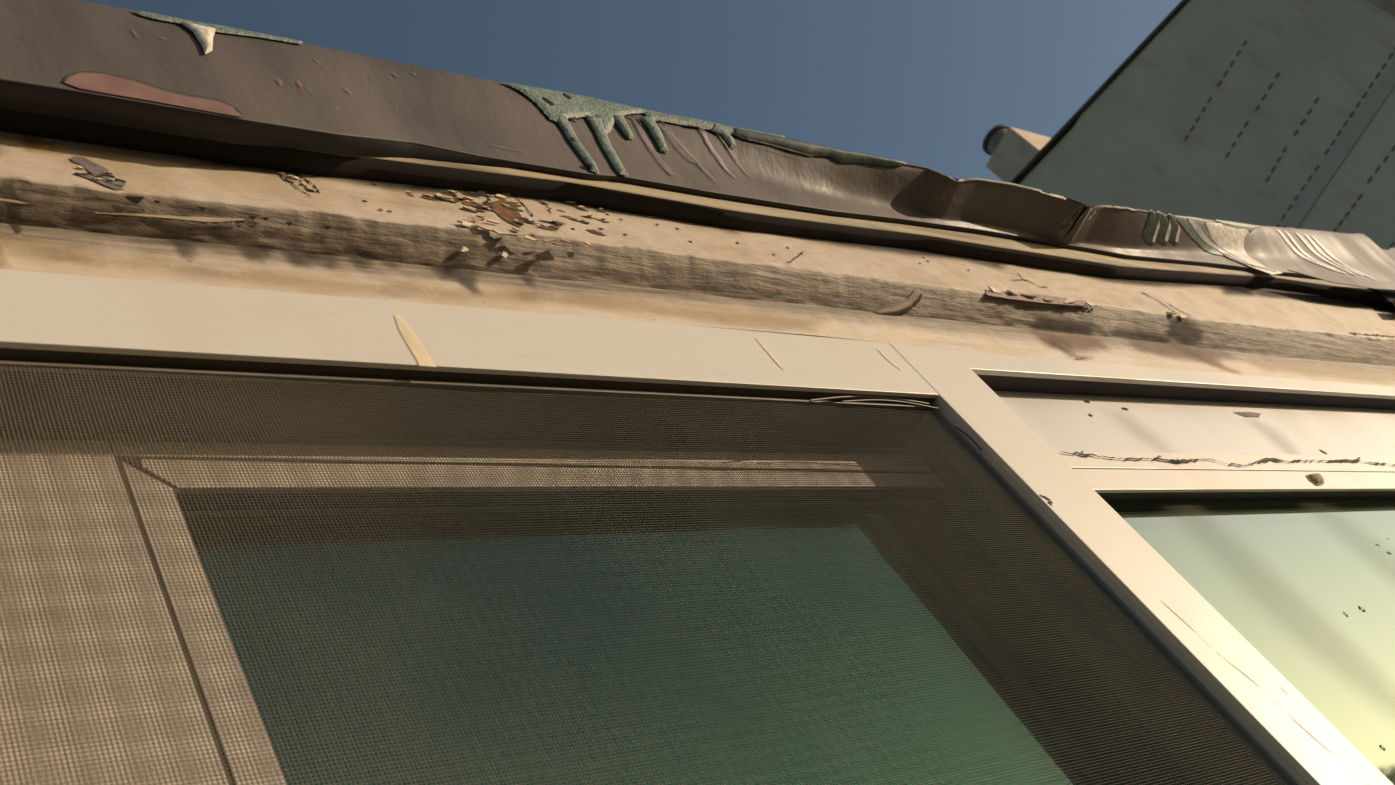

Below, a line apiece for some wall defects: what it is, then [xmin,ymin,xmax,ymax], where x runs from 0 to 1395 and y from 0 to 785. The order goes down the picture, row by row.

damp [2,181,20,218]
peeling [70,156,270,224]
damp [200,158,444,192]
spalling [406,186,634,258]
damp [563,201,653,216]
damp [799,236,1000,267]
damp [434,256,477,291]
damp [1037,267,1395,312]